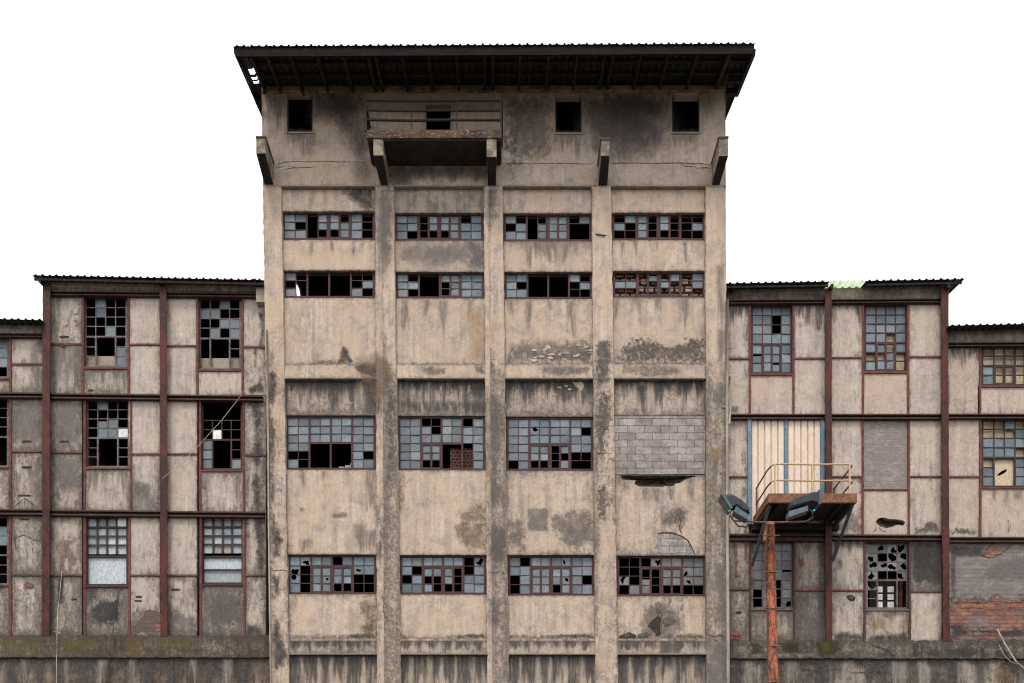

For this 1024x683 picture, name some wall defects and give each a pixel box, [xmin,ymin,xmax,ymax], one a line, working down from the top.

peeling [530,343,593,362]
water stain [246,347,608,597]
spalling [620,476,696,487]
spalling [876,518,905,528]
flaking render [657,532,695,555]
water stain [86,589,119,624]
flaking render [619,607,675,639]
flaking render [949,593,1024,641]